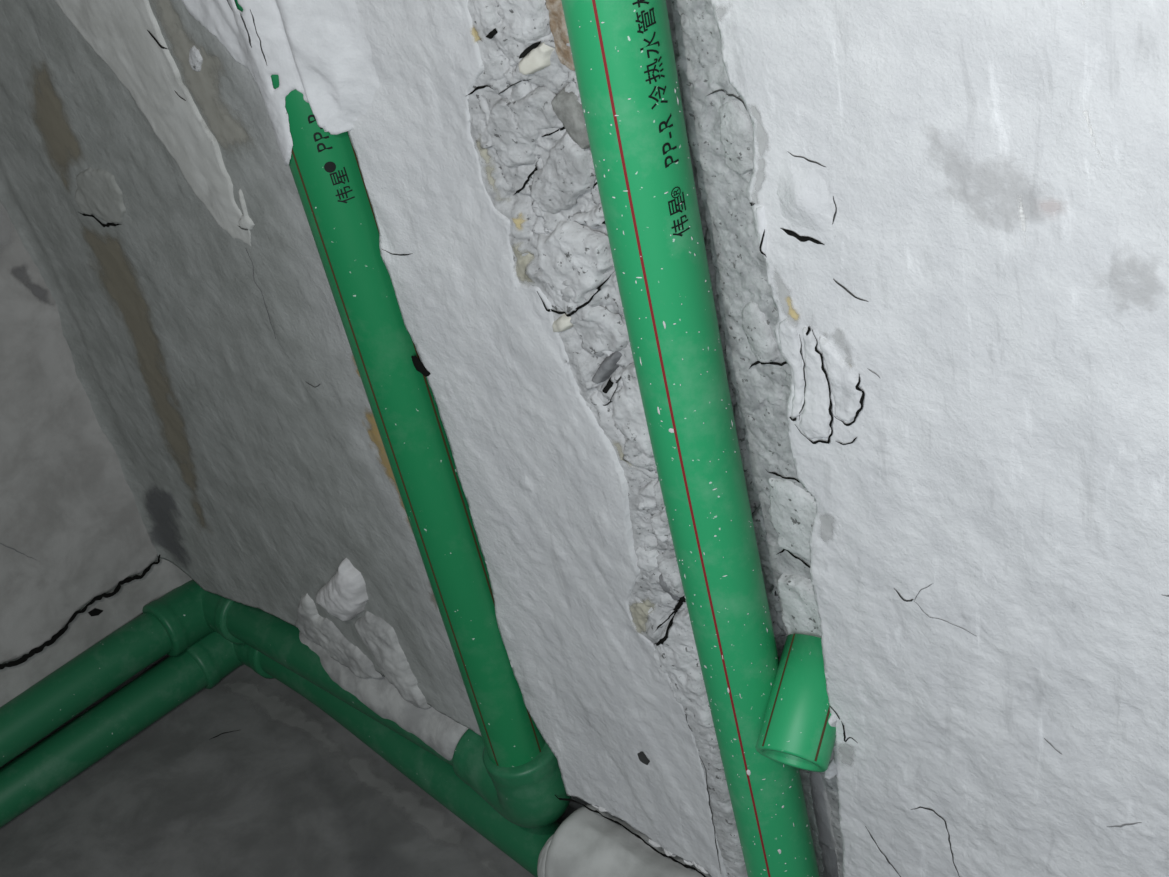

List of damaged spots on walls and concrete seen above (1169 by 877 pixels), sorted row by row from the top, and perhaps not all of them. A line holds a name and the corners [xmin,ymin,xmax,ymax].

damp [34,69,80,186]
peeling [55,0,252,247]
damp [85,229,204,526]
spalling [468,0,748,877]
spalling [666,0,865,662]
crack [833,279,868,302]
damp [146,490,186,563]
crack [0,555,161,670]
crack [554,794,709,877]
spalling [799,744,854,877]